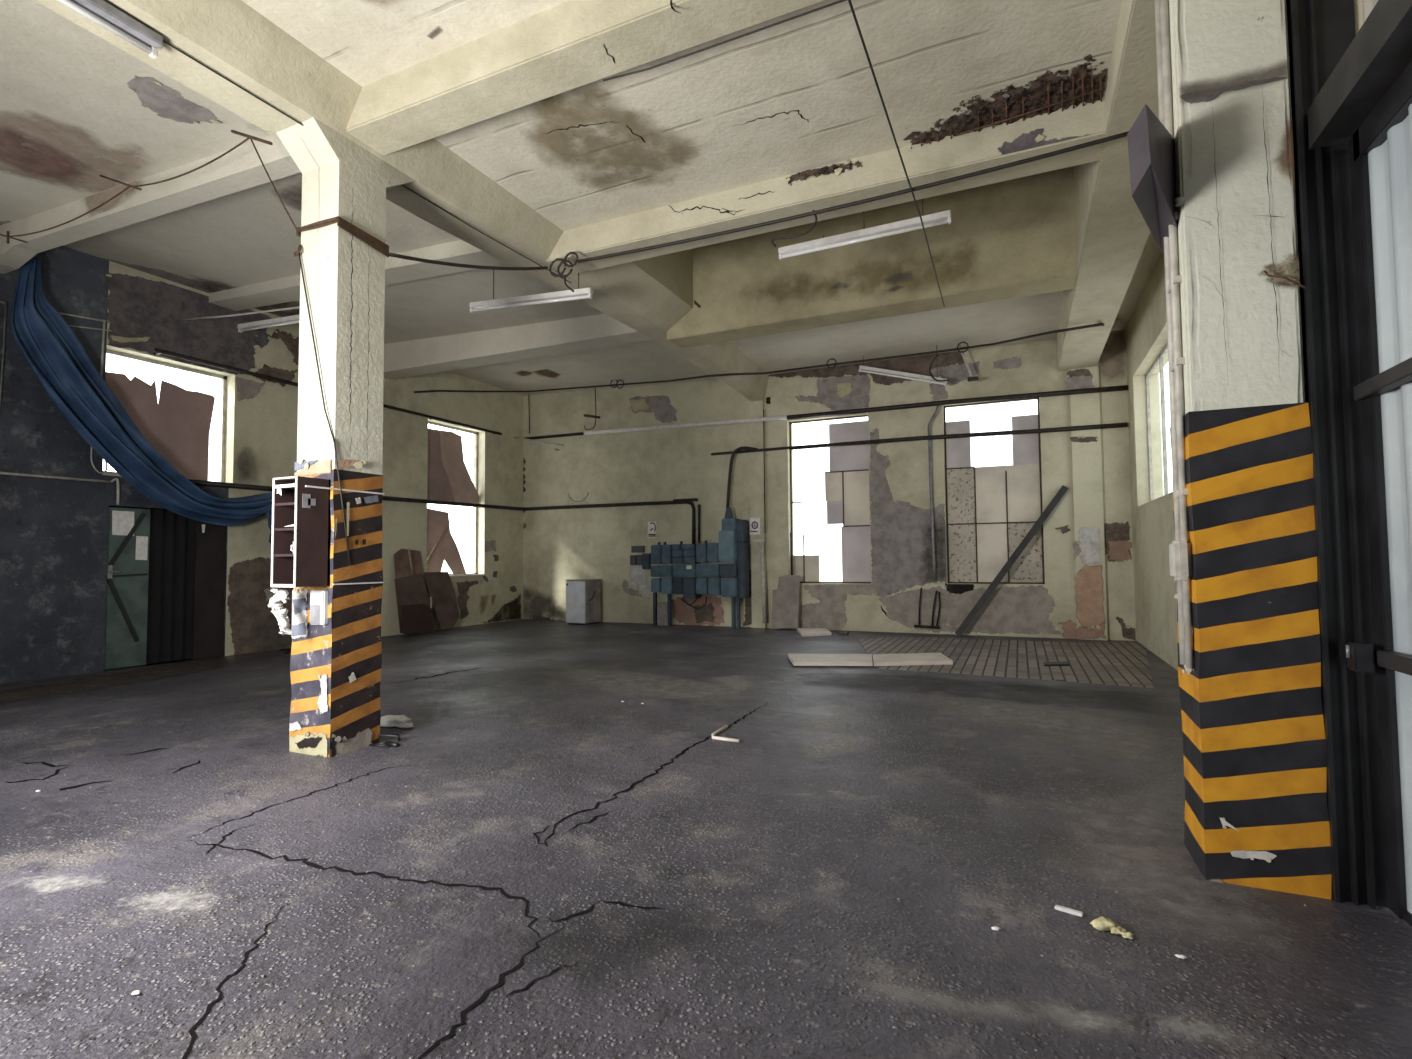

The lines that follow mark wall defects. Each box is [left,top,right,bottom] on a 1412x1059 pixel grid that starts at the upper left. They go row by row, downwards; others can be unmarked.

peeling [128,76,221,124]
spalling [903,55,1108,155]
water stain [0,115,140,212]
spalling [786,161,862,186]
spalling [1261,245,1306,288]
peeling [630,395,677,423]
peeling [800,428,1136,640]
peeling [227,557,308,655]
crack [533,703,767,846]
crack [181,765,664,1059]